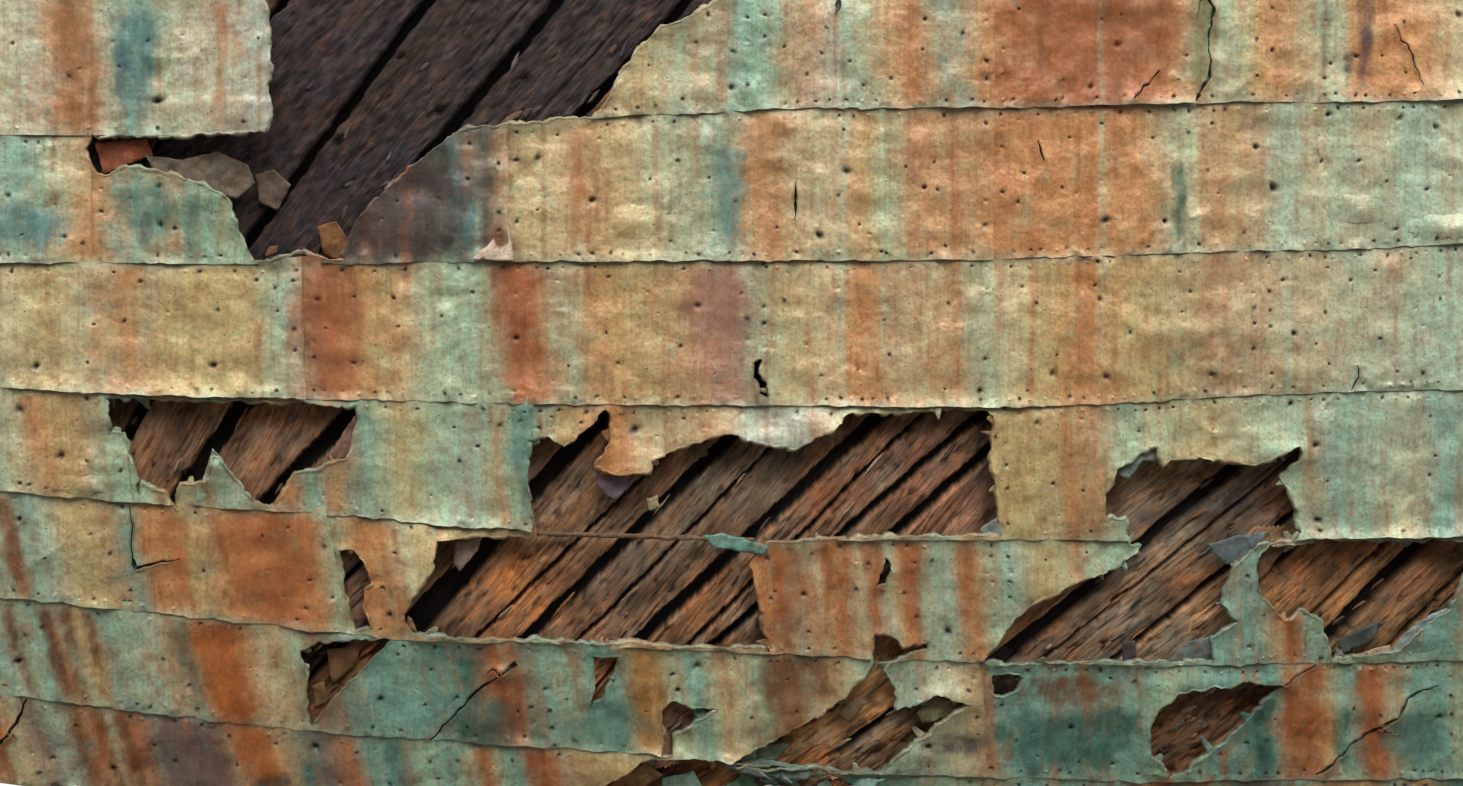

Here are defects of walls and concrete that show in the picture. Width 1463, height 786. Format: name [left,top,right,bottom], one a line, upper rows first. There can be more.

crack [1195,0,1217,100]
crack [1134,68,1160,98]
peeling [95,139,291,211]
peeling [1117,449,1157,479]
peeling [595,469,631,500]
peeling [453,537,482,572]
peeling [537,530,768,555]
corrosion [41,612,99,680]
peeling [911,697,963,737]
crack [1316,684,1438,774]
peeling [609,760,701,786]
peeling [716,743,885,786]